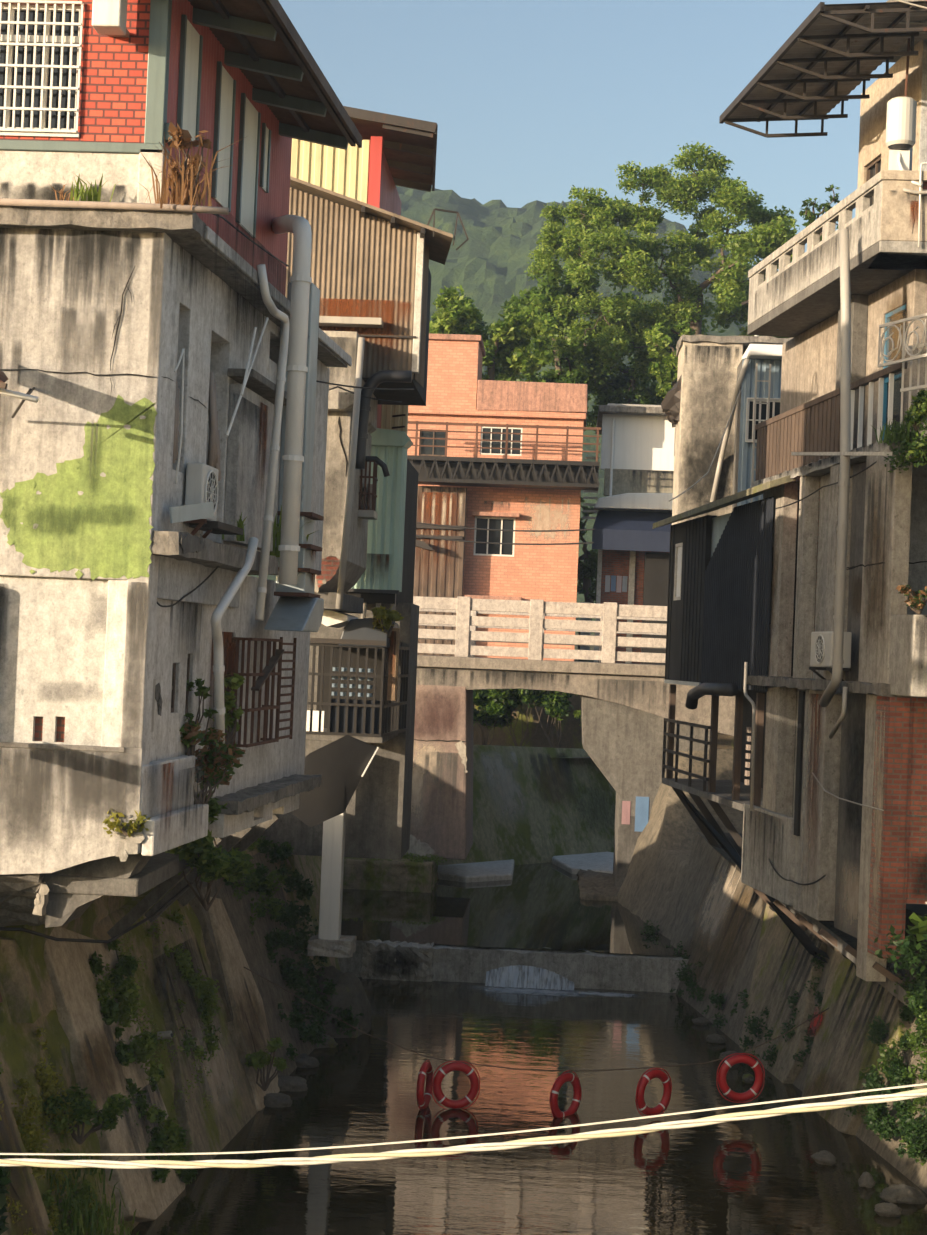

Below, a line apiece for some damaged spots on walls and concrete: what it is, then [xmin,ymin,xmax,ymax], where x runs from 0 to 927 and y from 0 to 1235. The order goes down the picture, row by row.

leakage [0,227,15,264]
leakage [37,229,200,300]
crack [0,267,205,407]
leakage [95,312,118,332]
corrosion [320,298,410,343]
leakage [0,348,21,369]
crack [846,561,927,584]